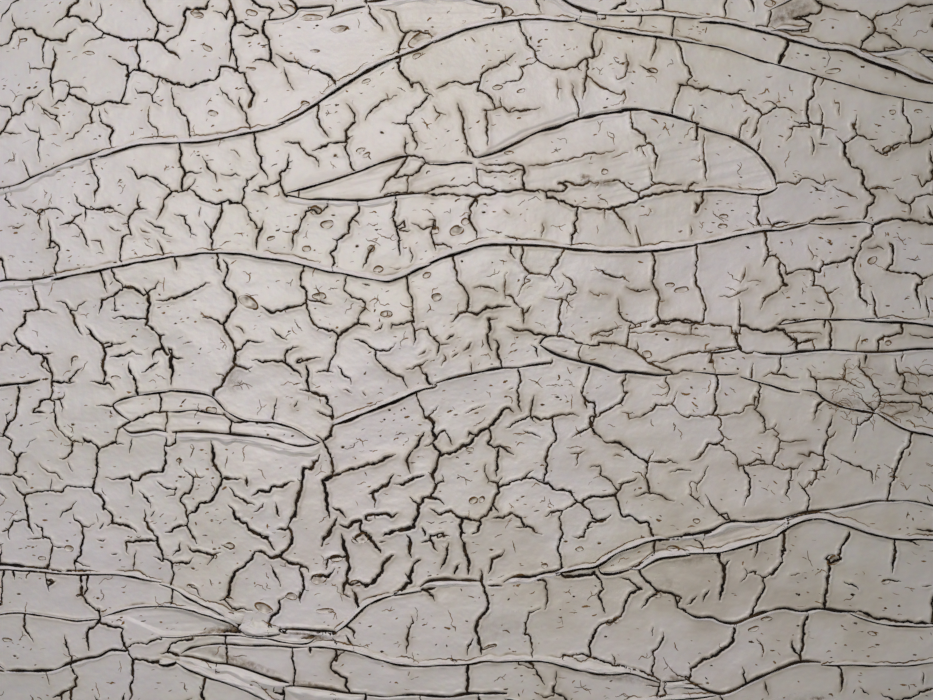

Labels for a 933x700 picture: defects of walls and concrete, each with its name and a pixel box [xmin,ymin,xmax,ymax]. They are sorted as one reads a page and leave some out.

crack [776,174,858,223]
crack [884,431,913,500]
crack [741,520,933,625]
crack [184,623,245,700]
crack [267,597,287,636]
crack [273,611,370,700]
crack [406,608,419,676]
crack [450,541,515,700]
crack [518,576,567,700]
crack [562,570,737,698]
crack [791,612,809,660]
crack [837,665,933,700]